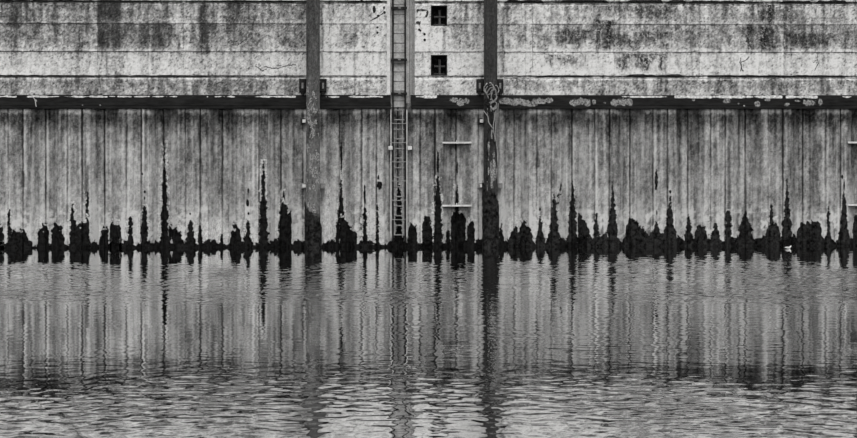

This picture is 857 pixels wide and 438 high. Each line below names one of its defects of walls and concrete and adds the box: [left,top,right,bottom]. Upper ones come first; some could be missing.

damp [556,5,672,70]
damp [739,5,833,50]
damp [203,219,229,243]
damp [323,189,333,243]